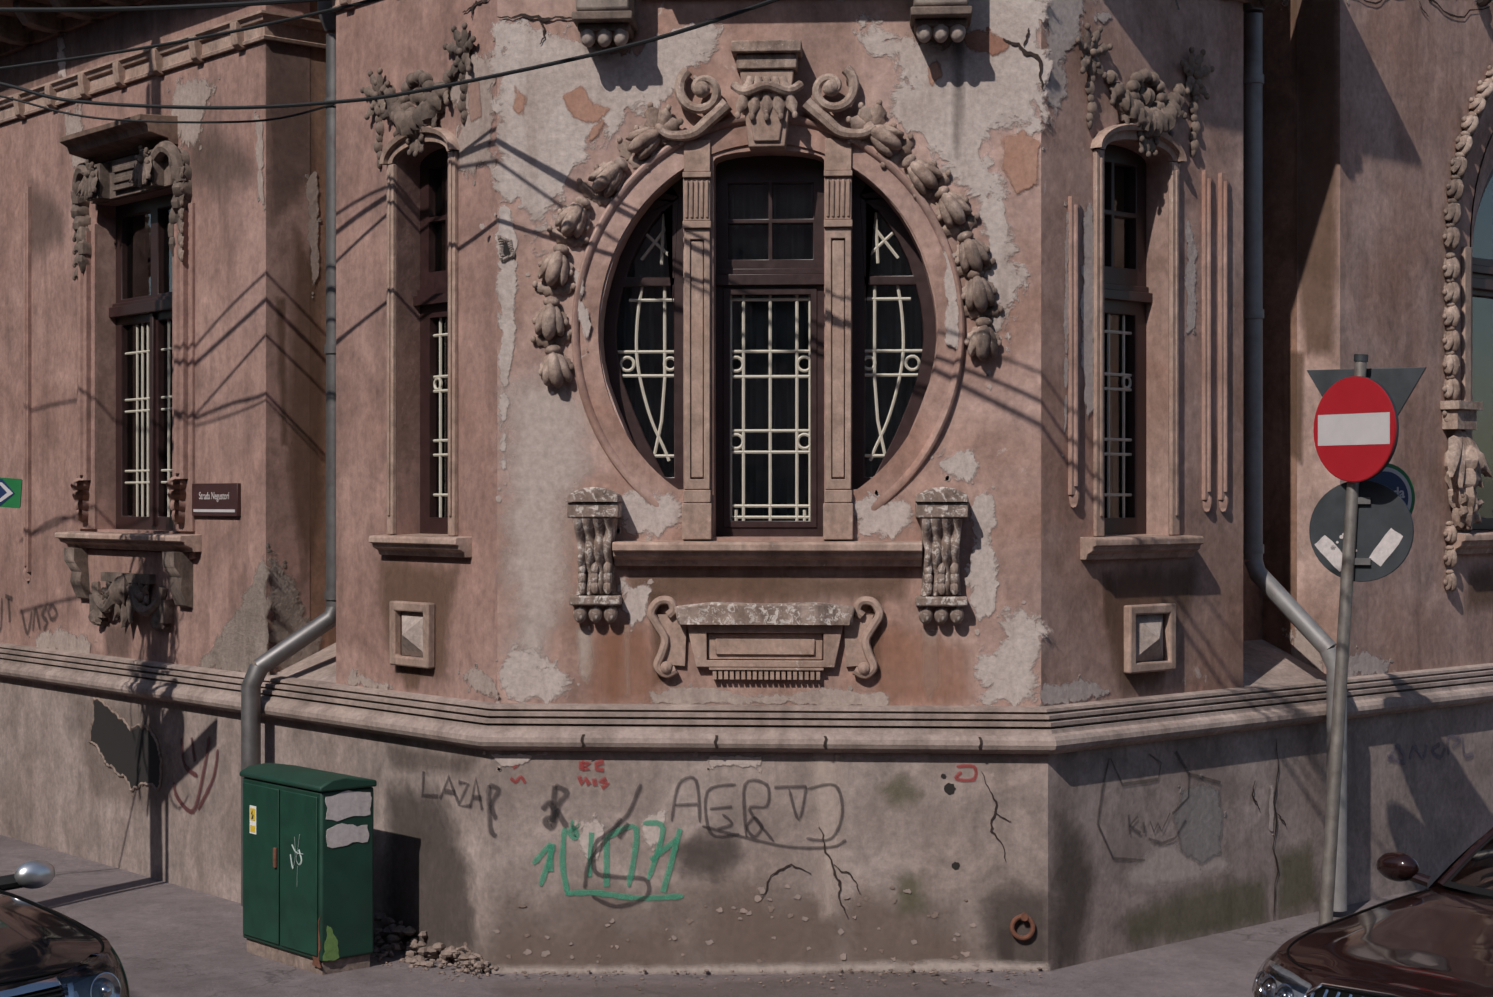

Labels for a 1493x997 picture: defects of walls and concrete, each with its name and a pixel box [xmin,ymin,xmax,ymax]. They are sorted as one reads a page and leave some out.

crack [1418,0,1490,18]
flaking render [853,0,1112,390]
flaking render [449,18,724,503]
flaking render [930,449,1110,707]
flaking render [458,642,580,704]
crack [978,737,1011,861]
crack [762,827,861,919]